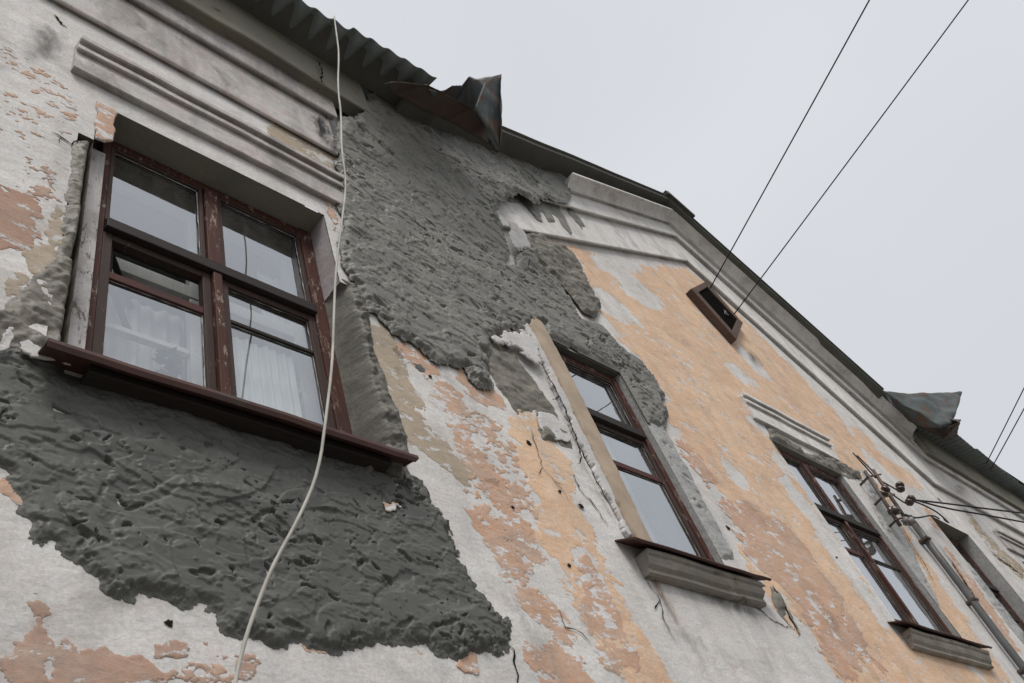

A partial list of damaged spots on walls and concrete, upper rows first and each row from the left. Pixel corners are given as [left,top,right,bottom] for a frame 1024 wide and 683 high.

flaking render [0,47,93,366]
peeling [0,477,23,505]
peeling [324,279,674,683]
crack [531,363,620,523]
peeling [509,221,1024,683]
peeling [0,593,261,683]
crack [510,645,519,683]
crack [646,579,676,641]